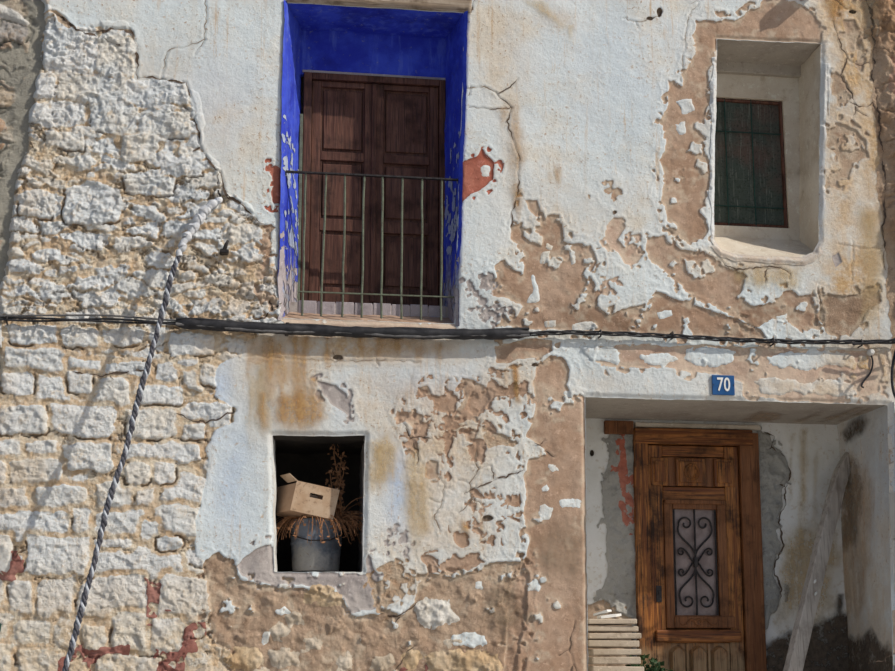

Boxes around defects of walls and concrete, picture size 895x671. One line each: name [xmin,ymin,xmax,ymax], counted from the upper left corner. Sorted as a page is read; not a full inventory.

crack [60,0,207,96]
crack [193,120,269,227]
crack [468,81,520,227]
peeling [459,0,891,404]
crack [833,0,890,275]
peeling [0,0,637,671]
damp [829,410,865,441]
spalling [757,427,791,630]
damp [828,460,861,564]
damp [766,632,792,671]
damp [803,595,895,671]